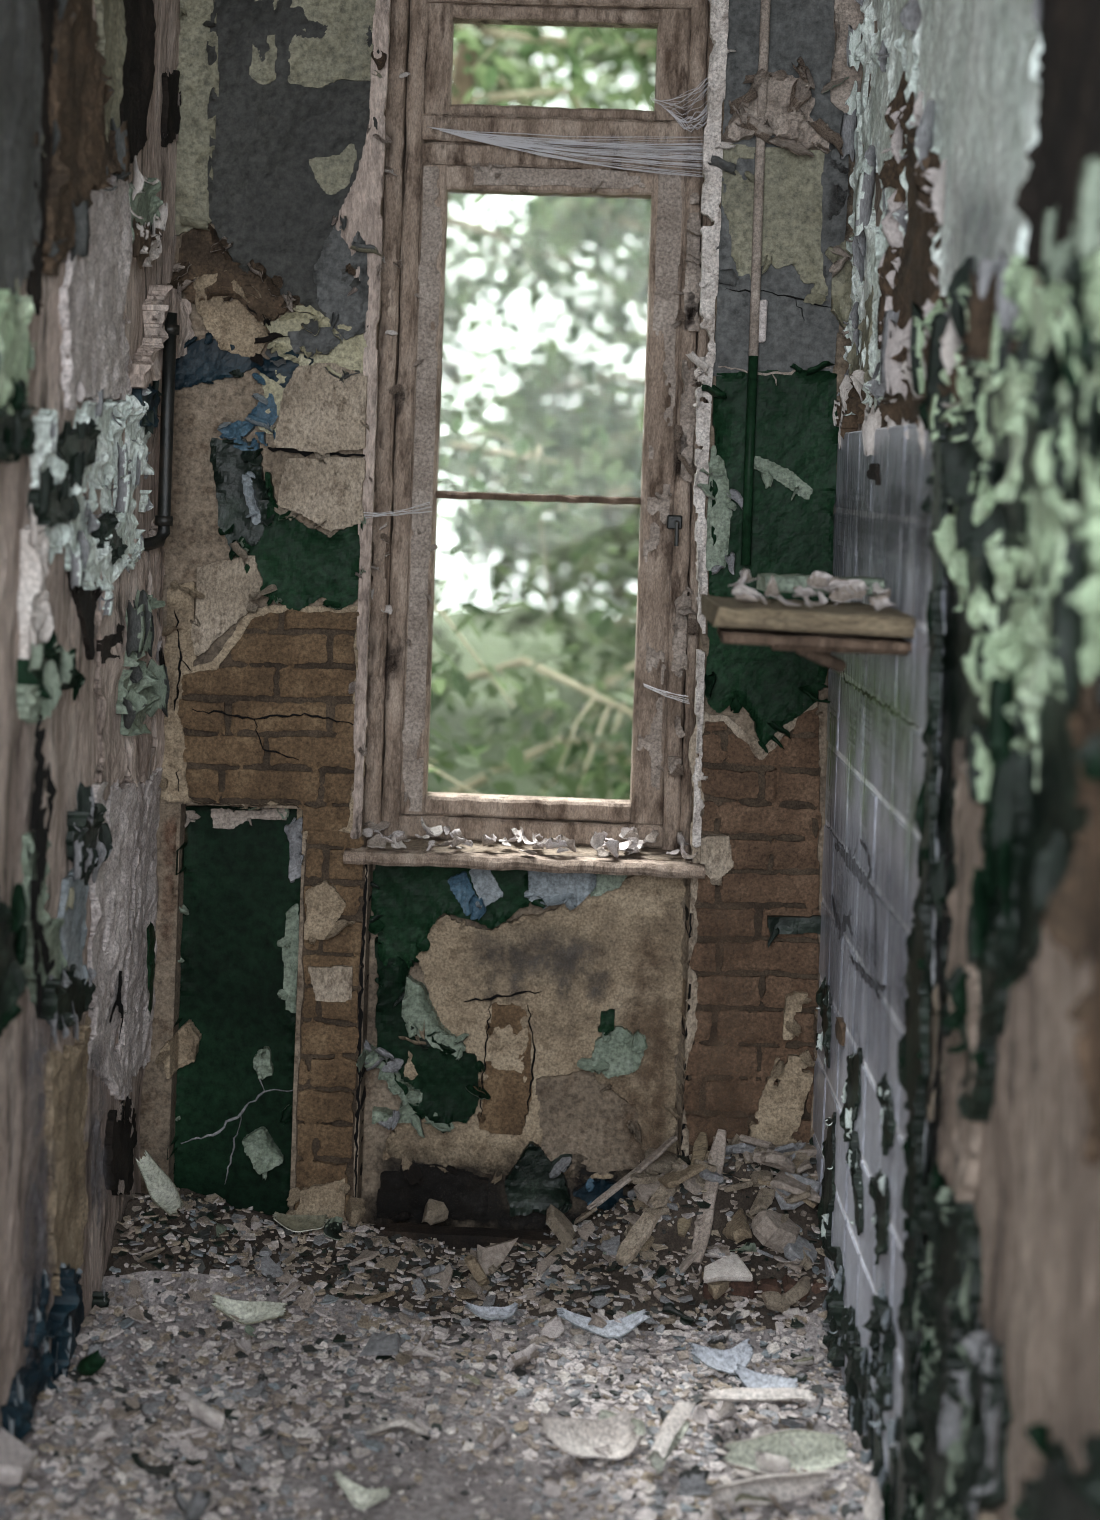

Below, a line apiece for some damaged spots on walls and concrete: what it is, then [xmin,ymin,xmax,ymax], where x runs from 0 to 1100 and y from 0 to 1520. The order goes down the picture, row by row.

crack [181,1079,293,1183]
peeling [0,0,659,1225]
peeling [472,0,1100,1520]